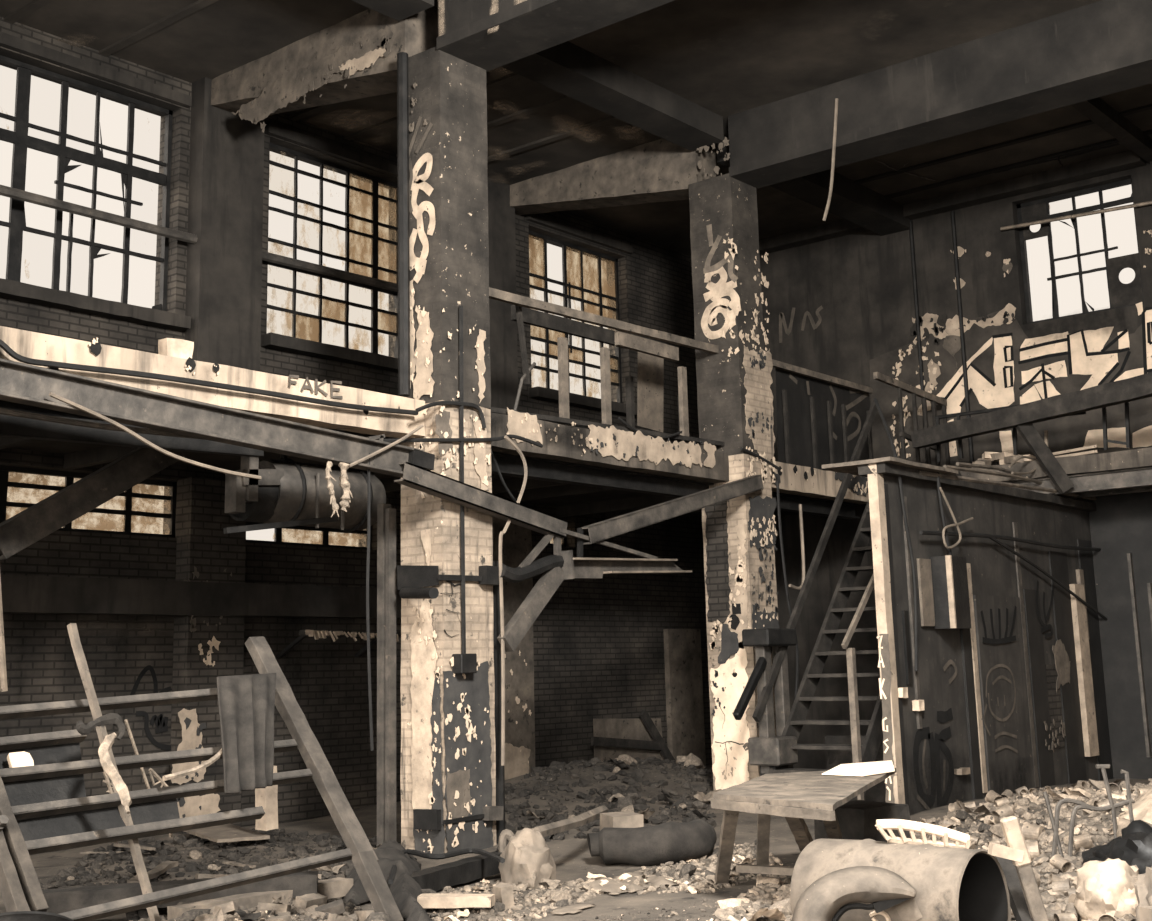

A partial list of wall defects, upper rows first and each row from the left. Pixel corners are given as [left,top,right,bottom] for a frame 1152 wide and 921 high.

peeling [232,26,393,133]
peeling [409,83,427,132]
peeling [696,137,730,177]
peeling [723,238,738,270]
peeling [410,279,491,490]
peeling [890,303,1017,458]
peeling [507,407,716,468]
peeling [835,472,868,497]
peeling [420,529,432,566]
peeling [705,250,816,790]
peeling [410,586,531,854]